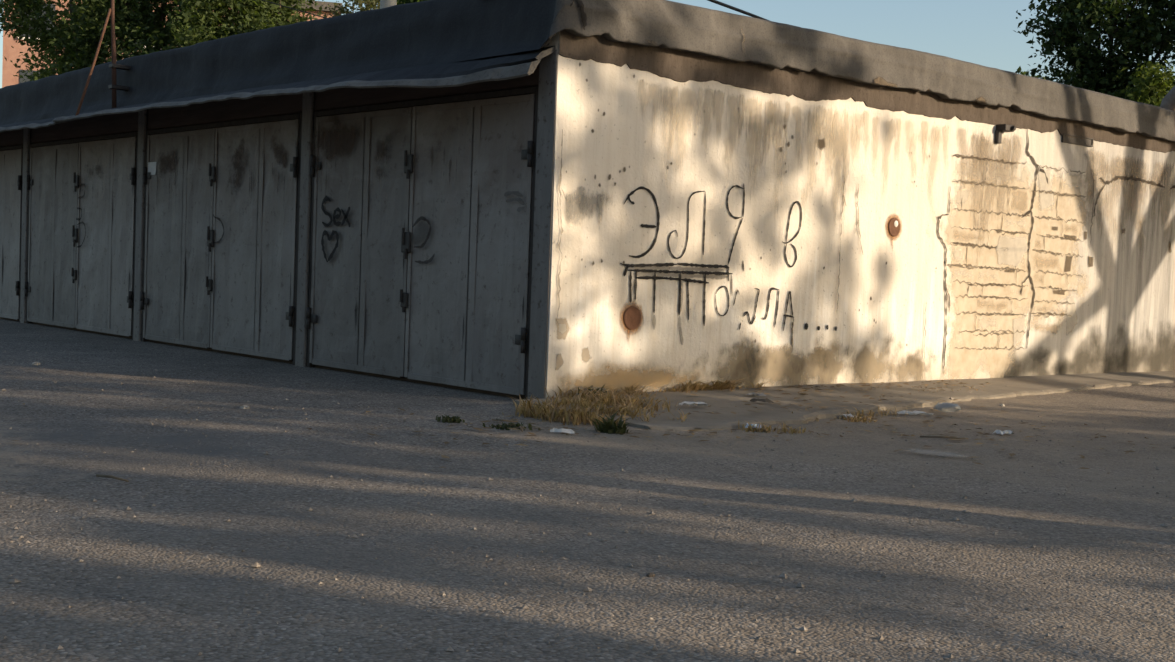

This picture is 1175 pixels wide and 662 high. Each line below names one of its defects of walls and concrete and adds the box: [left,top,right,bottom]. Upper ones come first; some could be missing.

spalling [944,154,1093,379]
leakage [1033,329,1175,375]